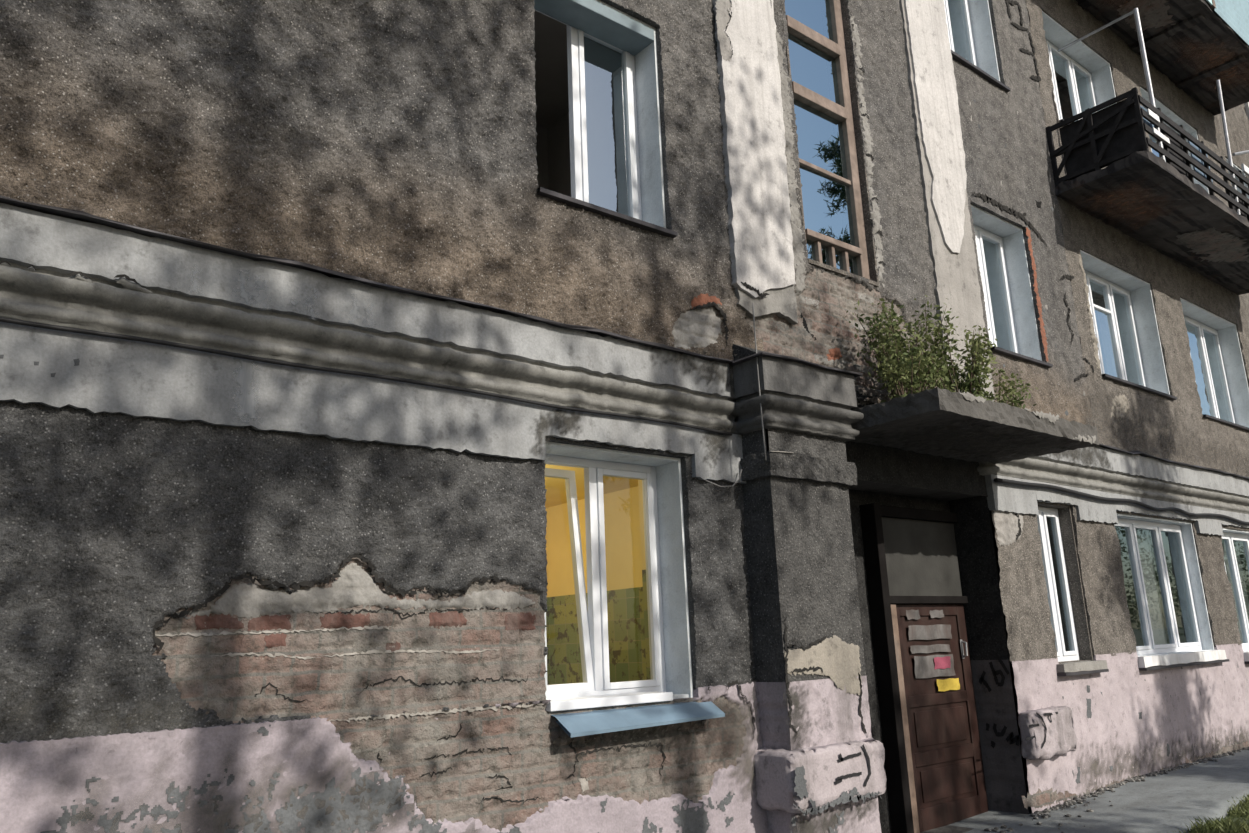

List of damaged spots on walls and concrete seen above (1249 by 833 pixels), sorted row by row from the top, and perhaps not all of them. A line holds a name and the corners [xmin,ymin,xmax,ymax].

spalling [745,16,910,406]
crack [972,192,1047,245]
spalling [672,293,729,349]
crack [1061,274,1094,382]
spalling [40,554,756,833]
peeling [784,635,862,695]